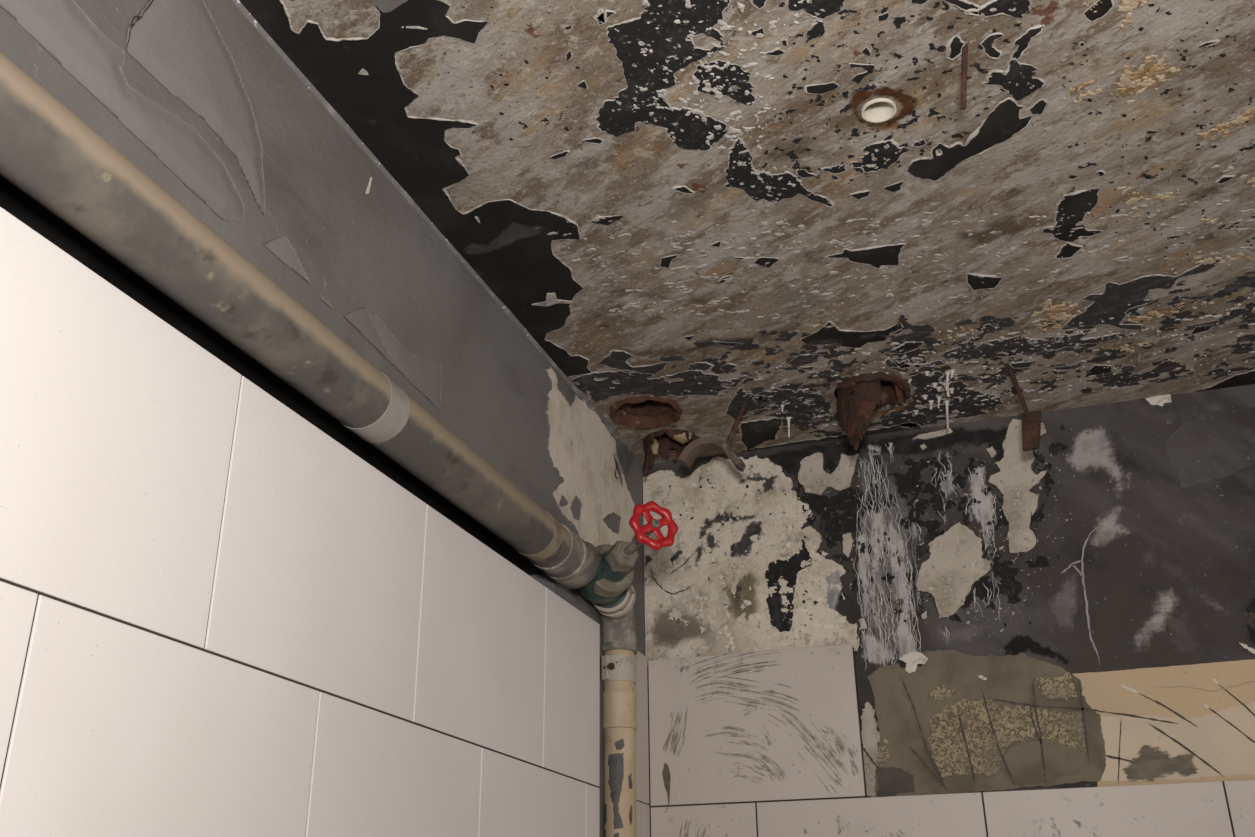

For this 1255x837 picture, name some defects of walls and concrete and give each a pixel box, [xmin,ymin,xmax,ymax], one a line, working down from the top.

peeling [581,0,1049,208]
corrosion [849,86,916,129]
peeling [1040,170,1106,259]
peeling [239,0,875,667]
peeling [787,257,1222,451]
damp [656,611,707,646]
damp [670,511,762,568]
damp [730,442,921,670]
peeling [915,522,993,621]
damp [931,451,1008,645]
peeling [986,419,1049,554]
damp [1066,429,1129,491]